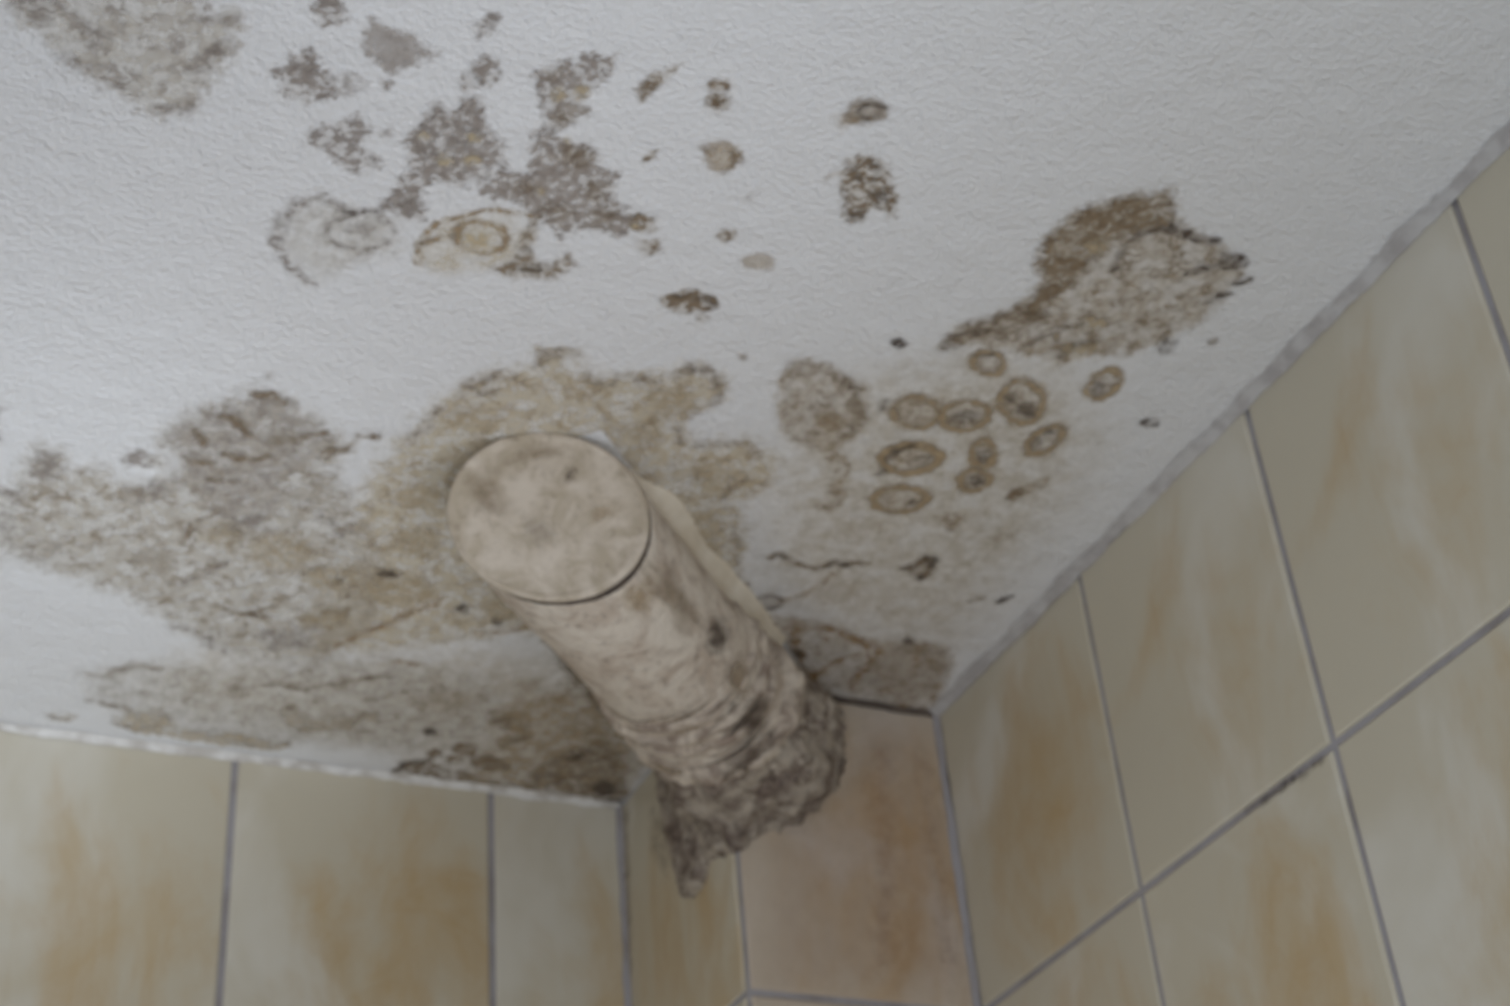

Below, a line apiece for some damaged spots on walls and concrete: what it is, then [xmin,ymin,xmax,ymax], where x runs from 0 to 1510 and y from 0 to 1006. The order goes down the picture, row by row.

leakage [26,0,238,110]
leakage [271,48,334,102]
leakage [364,24,427,89]
leakage [309,120,380,173]
leakage [326,52,659,277]
leakage [811,197,1253,514]
leakage [4,350,770,665]
leakage [393,652,632,802]
leakage [730,700,767,774]